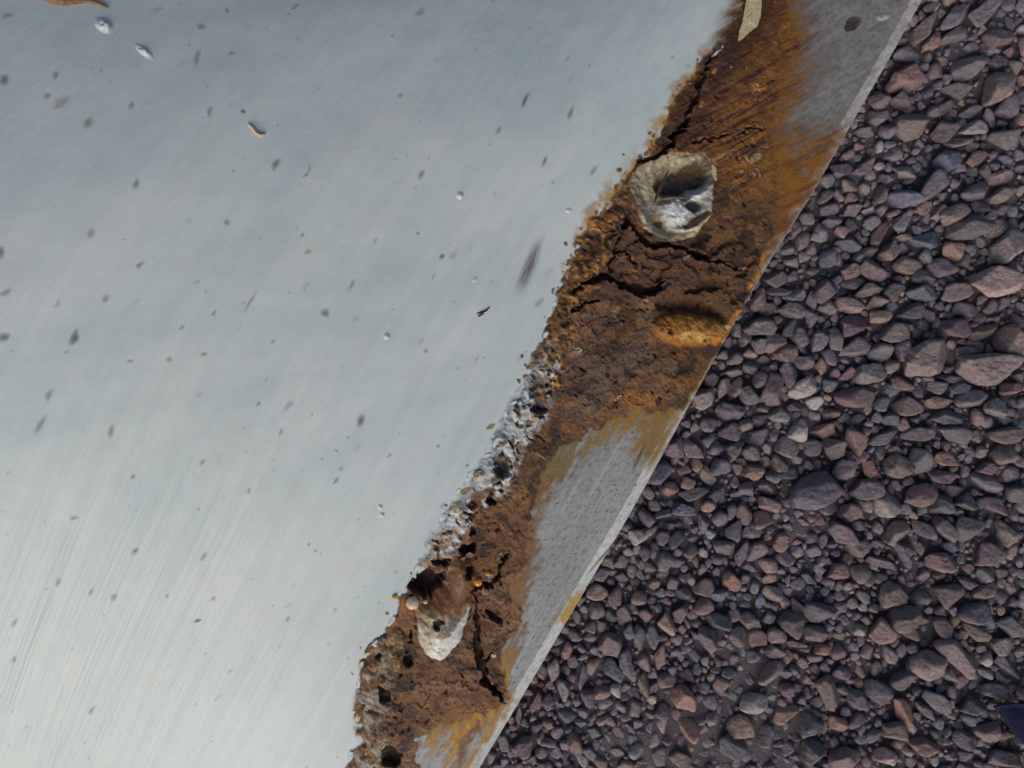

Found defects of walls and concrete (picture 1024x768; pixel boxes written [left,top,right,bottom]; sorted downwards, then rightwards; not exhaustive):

crack [633,45,763,172]
crack [570,216,742,313]
spalling [628,152,718,242]
peeling [420,342,562,570]
rust [347,0,846,768]
crack [471,553,510,706]